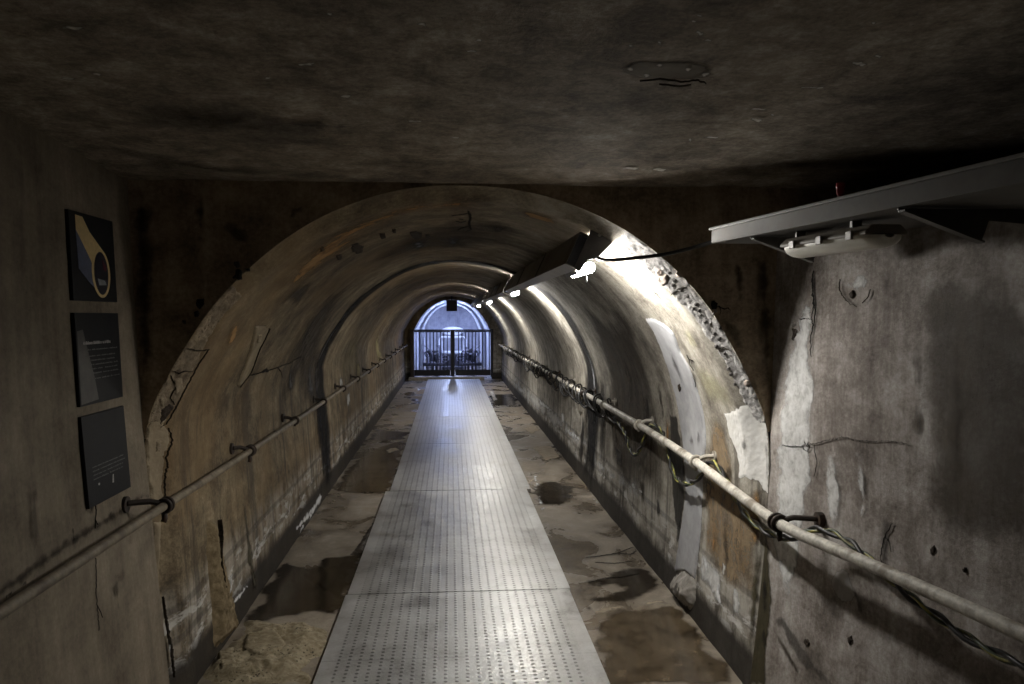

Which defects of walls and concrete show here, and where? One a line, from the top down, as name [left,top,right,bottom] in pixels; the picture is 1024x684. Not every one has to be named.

spalling [145,261,250,500]
water stain [284,260,517,483]
water stain [515,284,684,542]
spalling [621,232,769,493]
crack [799,271,816,357]
crack [784,436,906,476]